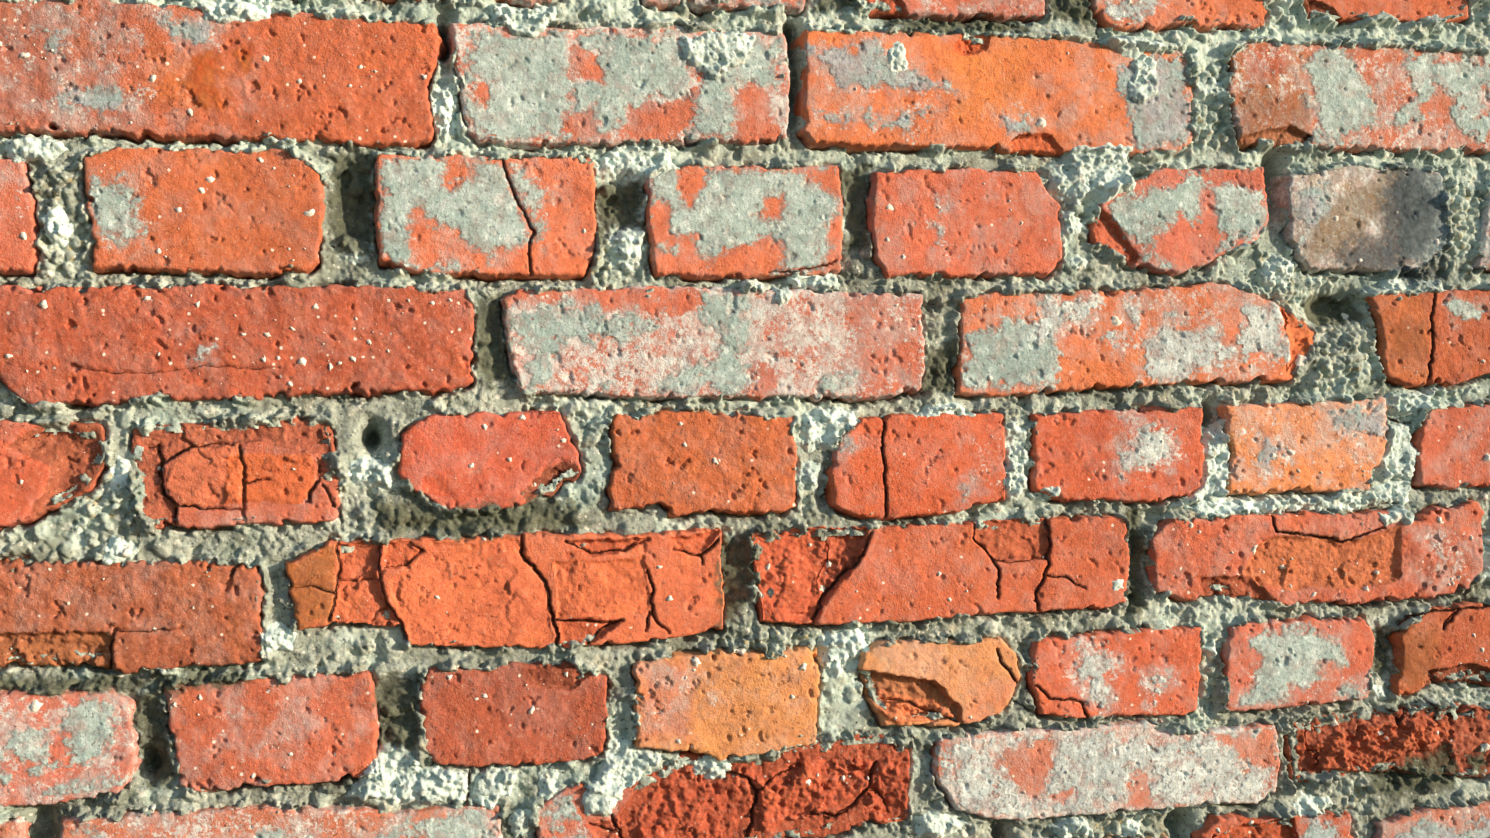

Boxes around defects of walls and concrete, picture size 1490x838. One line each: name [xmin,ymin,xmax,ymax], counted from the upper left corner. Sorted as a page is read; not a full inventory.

crack [503,159,535,275]
crack [1426,293,1436,381]
crack [149,443,267,526]
crack [296,457,424,640]
crack [520,538,720,645]
crack [812,417,887,625]
crack [971,518,1081,610]
crack [1272,502,1397,543]
spalling [537,670,962,838]
crack [726,764,800,838]
crack [811,762,888,819]
peeling [934,621,1490,819]